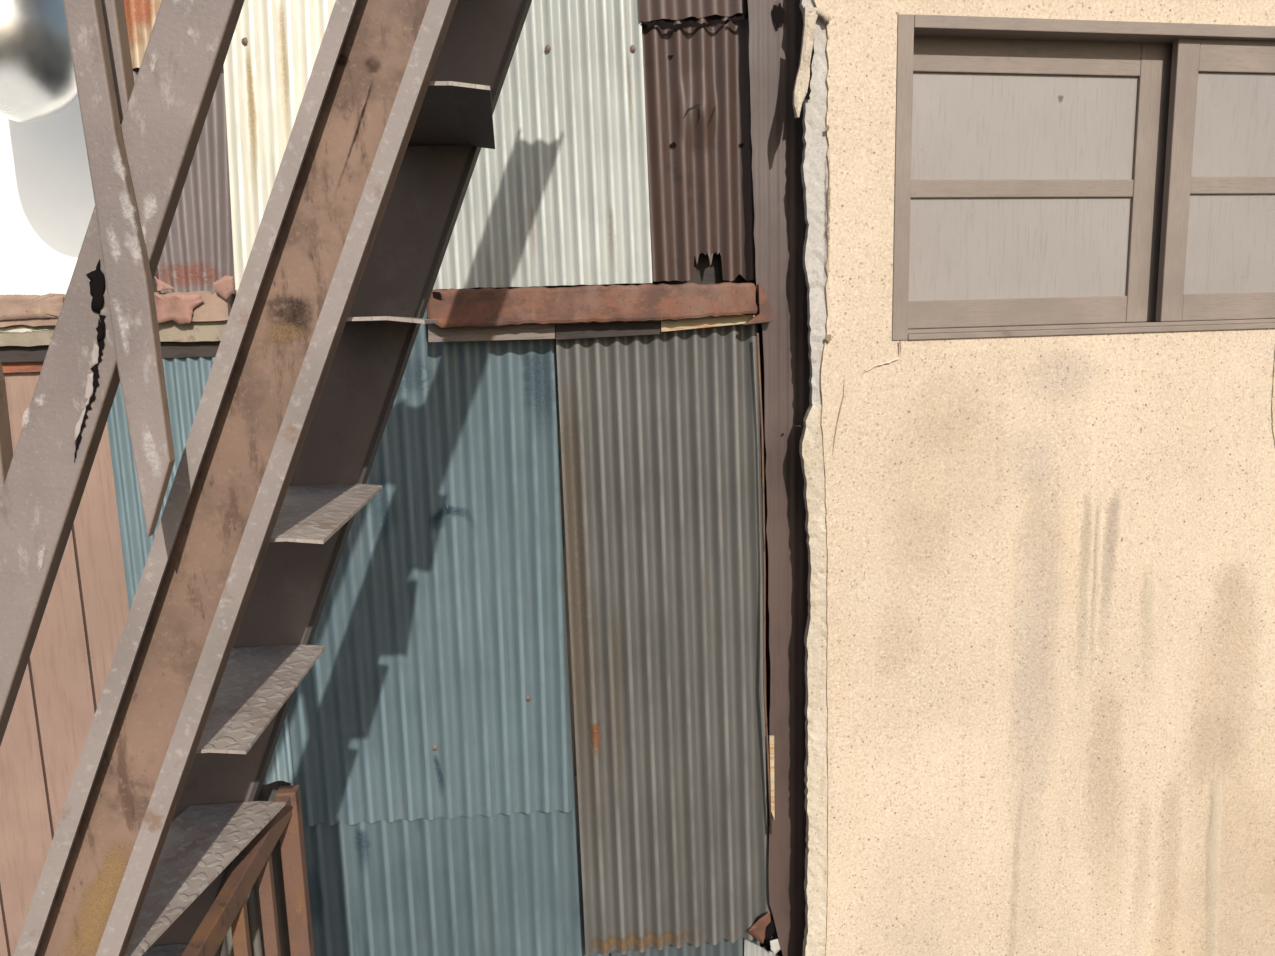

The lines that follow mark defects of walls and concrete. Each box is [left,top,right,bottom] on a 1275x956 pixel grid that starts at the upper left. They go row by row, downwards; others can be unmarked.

crack [74,315,105,462]
spalling [793,0,831,956]